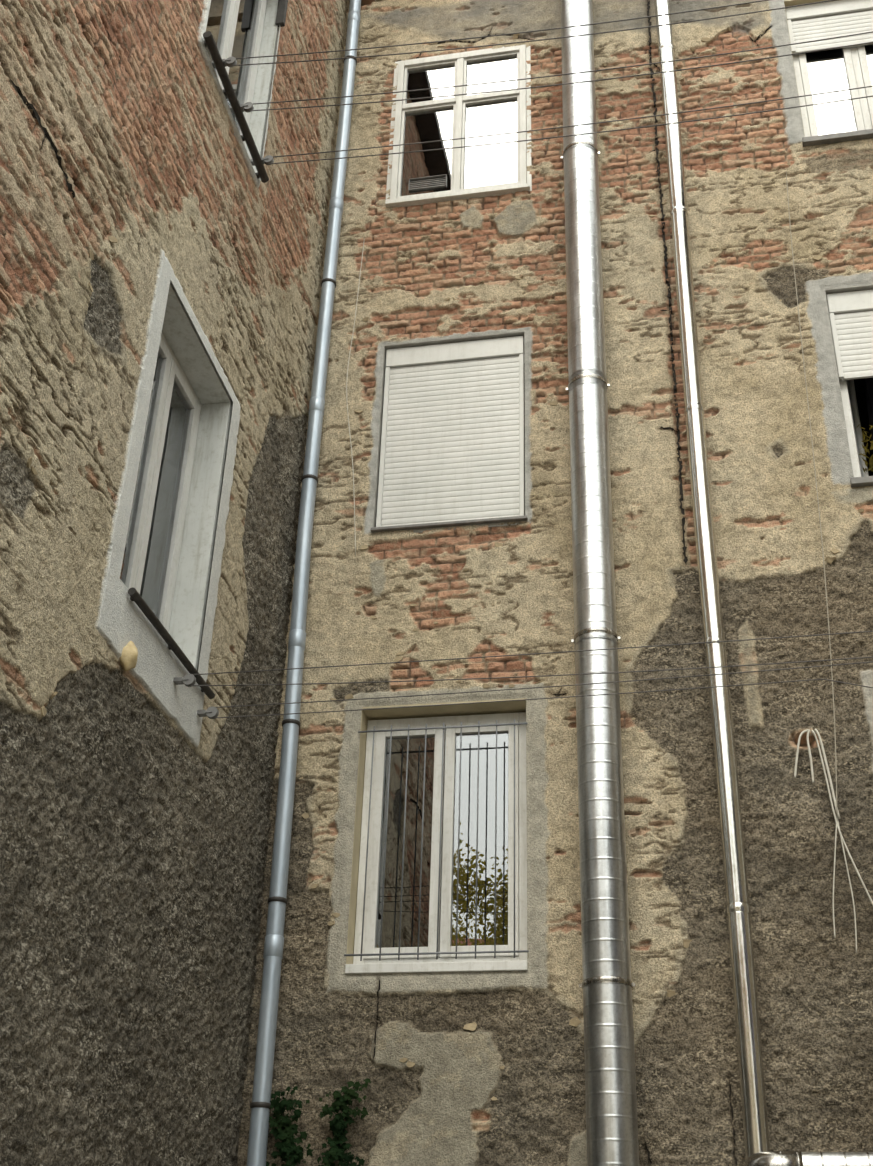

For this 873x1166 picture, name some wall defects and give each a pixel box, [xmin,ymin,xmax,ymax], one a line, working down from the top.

crack [10,79,75,198]
flaking render [0,0,340,358]
flaking render [348,32,569,433]
crack [396,31,533,62]
crack [647,0,688,565]
flaking render [675,22,873,178]
flaking render [0,411,309,1166]
crack [373,980,383,1059]
flaking render [266,777,586,1166]
flaking render [330,521,543,705]
flaking render [595,43,746,1166]
flaking render [719,501,873,1152]